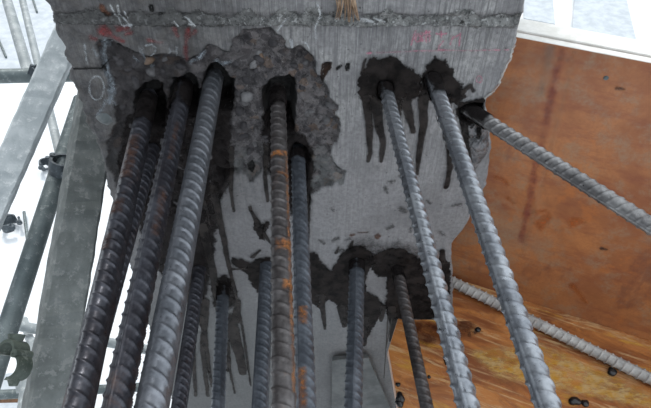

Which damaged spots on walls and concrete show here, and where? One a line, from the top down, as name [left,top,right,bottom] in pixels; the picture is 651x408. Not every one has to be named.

leakage [362,93,386,163]
leakage [396,94,429,175]
leakage [443,144,454,189]
spalling [61,27,346,408]
leakage [192,184,252,397]
leakage [337,305,347,328]
leakage [379,305,397,342]
leakage [415,322,440,343]
leakage [457,321,477,336]